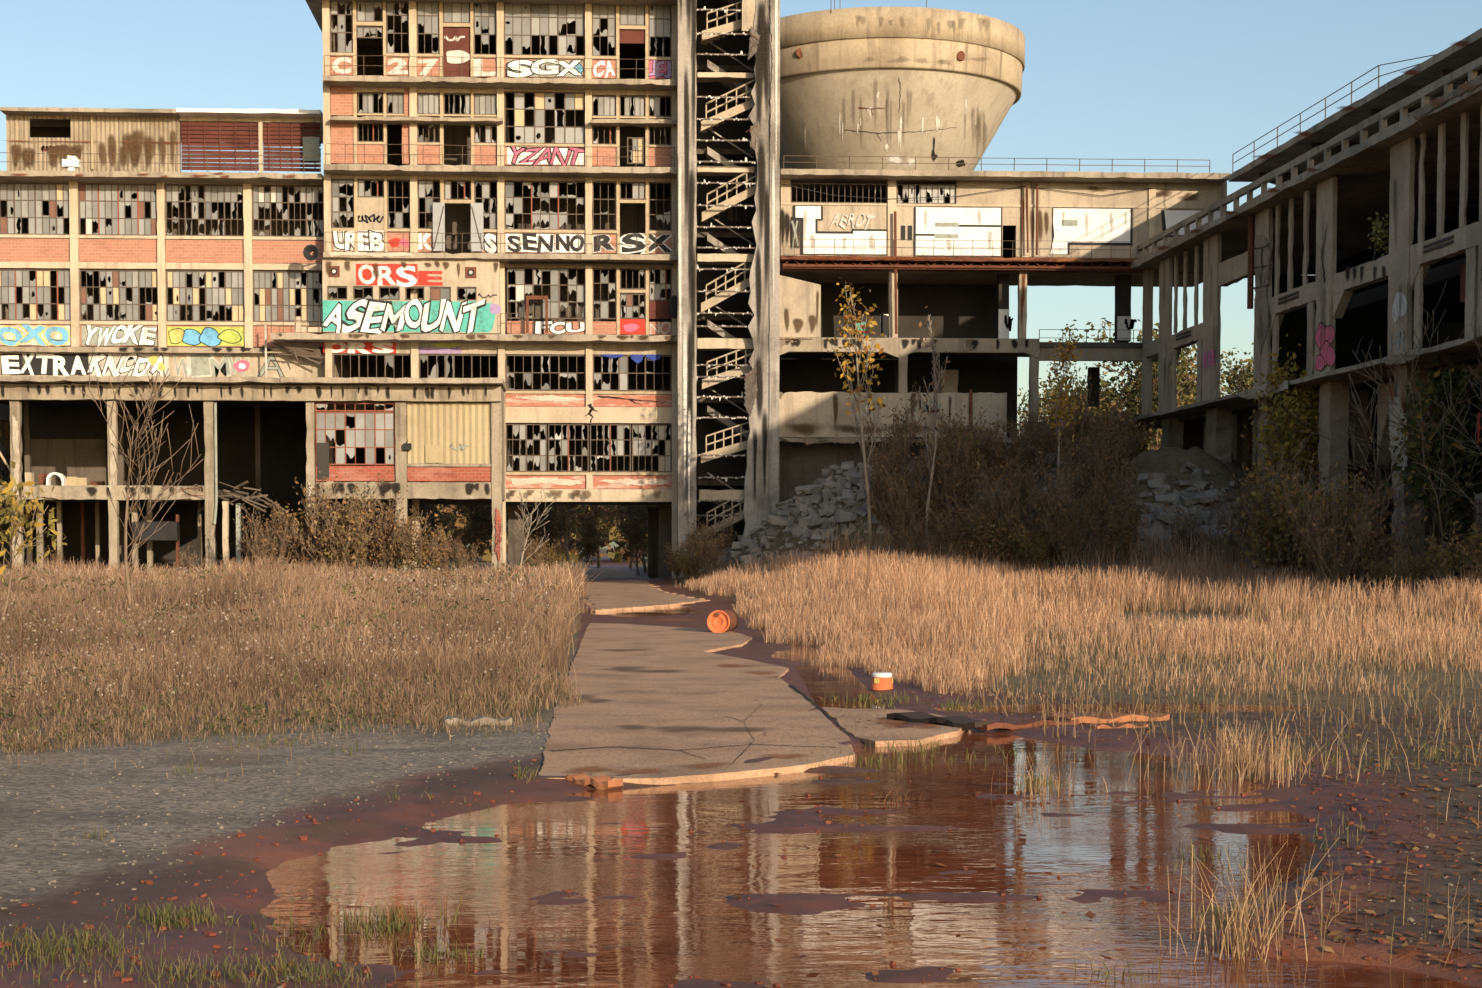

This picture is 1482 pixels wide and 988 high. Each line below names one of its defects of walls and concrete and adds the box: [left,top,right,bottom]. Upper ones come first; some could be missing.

water stain [11,131,176,166]
water stain [839,91,879,139]
water stain [885,116,915,166]
water stain [922,115,940,161]